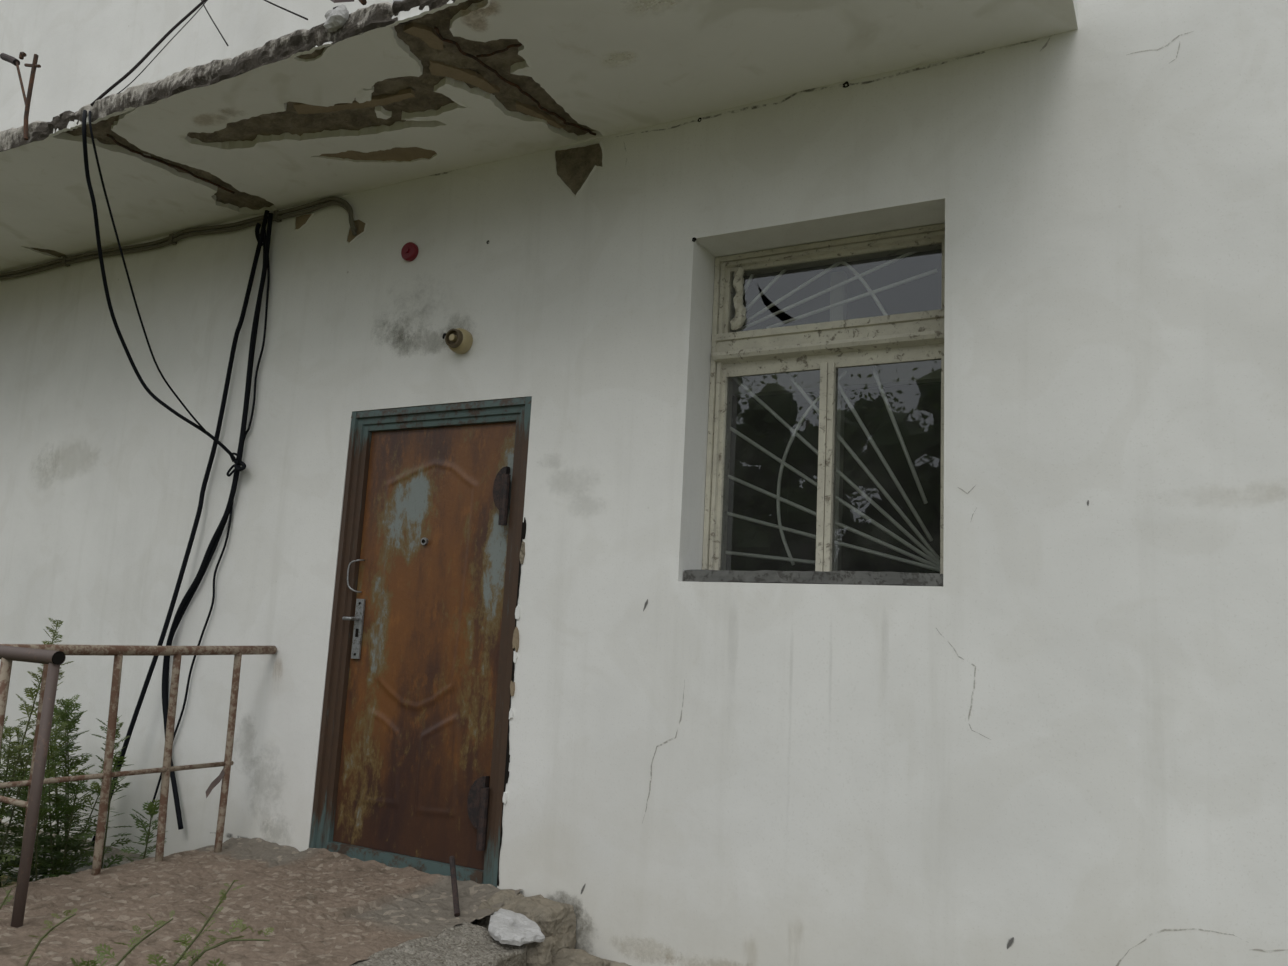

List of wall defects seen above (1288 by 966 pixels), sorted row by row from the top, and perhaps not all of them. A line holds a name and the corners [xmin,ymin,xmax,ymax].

spalling [181,0,607,197]
spalling [48,107,280,215]
spalling [18,245,71,259]